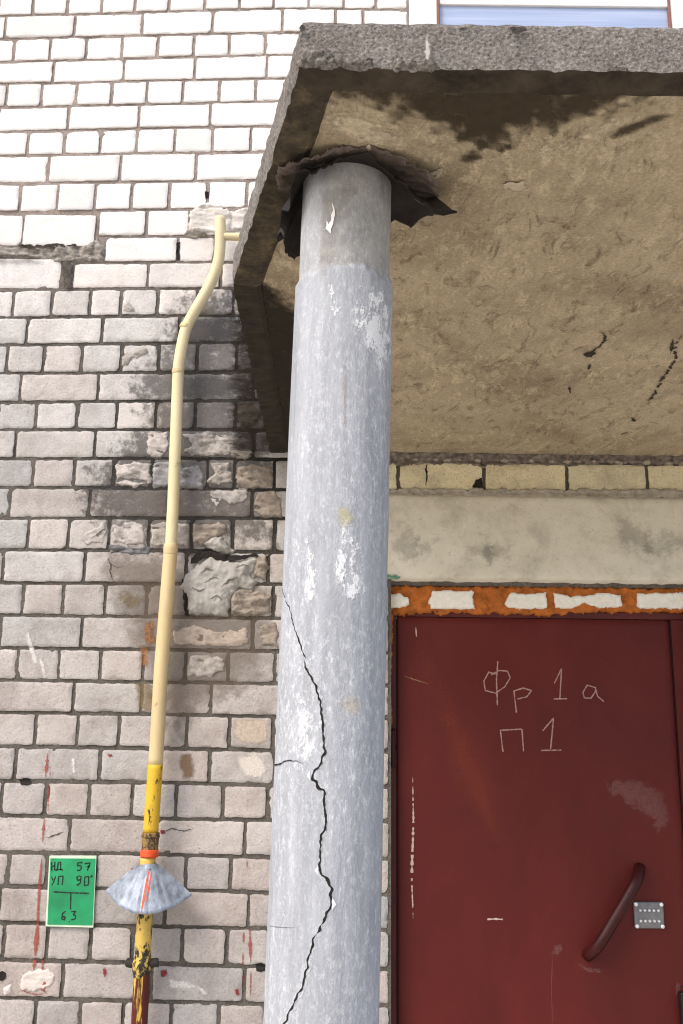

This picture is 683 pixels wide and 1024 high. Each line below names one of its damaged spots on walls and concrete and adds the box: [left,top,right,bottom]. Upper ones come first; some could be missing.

damp [326,90,669,162]
peeling [354,286,391,374]
crack [583,333,607,370]
crack [621,336,682,435]
spalling [115,431,282,520]
spalling [80,522,258,564]
peeling [305,539,316,600]
peeling [335,519,364,600]
spalling [173,579,279,678]
crack [273,590,336,1024]